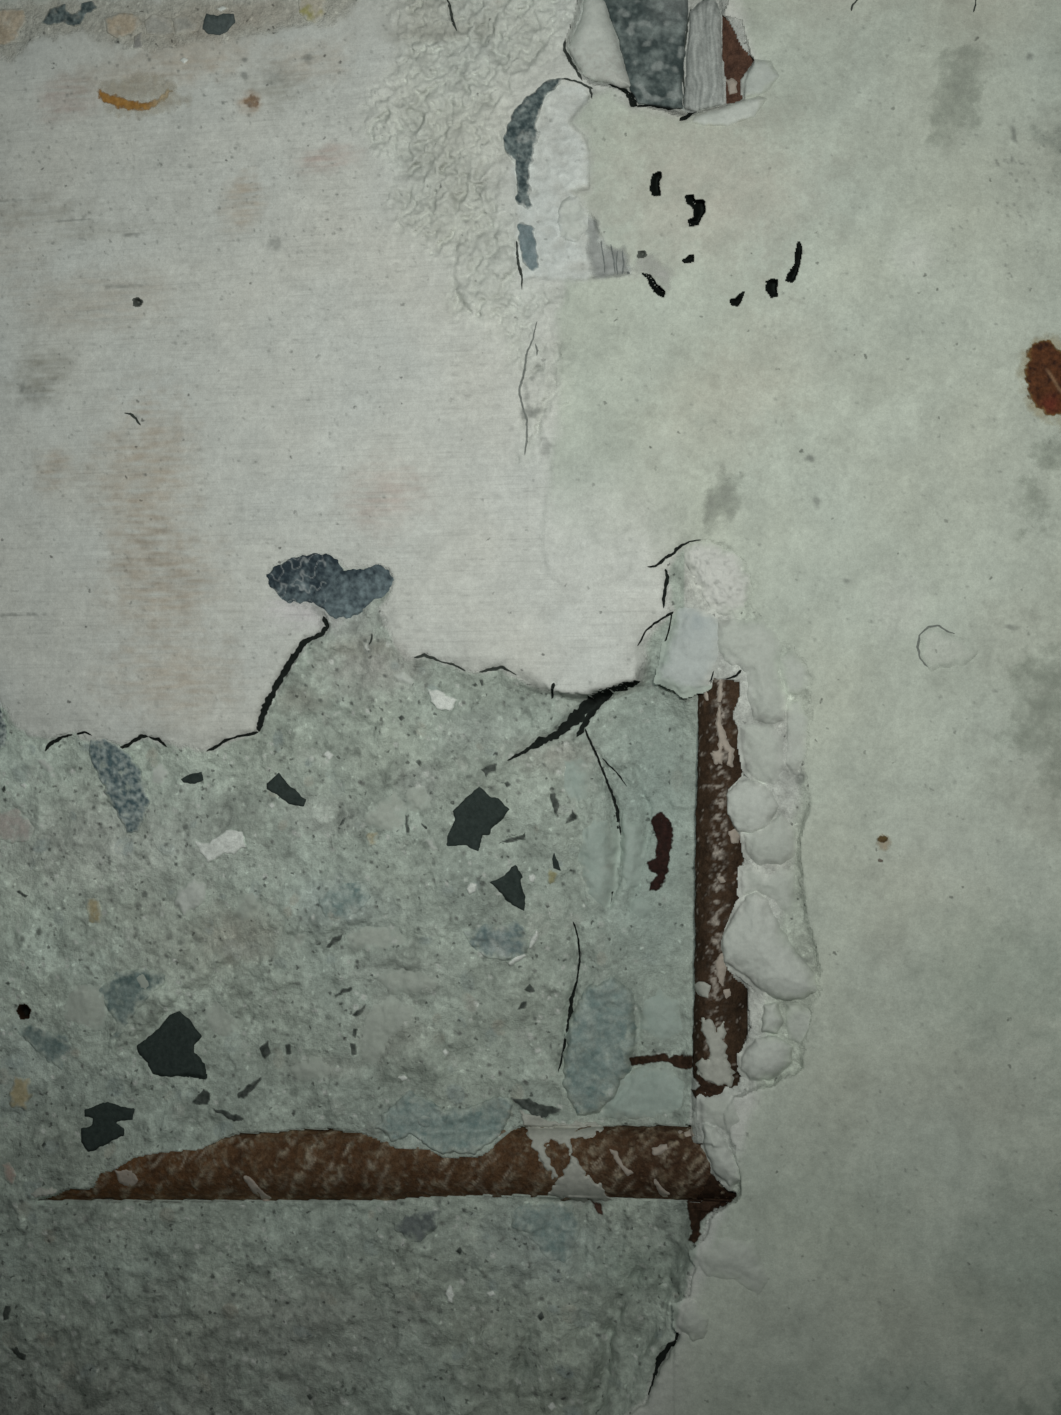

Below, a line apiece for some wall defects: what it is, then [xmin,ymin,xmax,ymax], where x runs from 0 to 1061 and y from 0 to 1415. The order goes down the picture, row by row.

spalling [503,0,779,297]
spalling [730,291,745,306]
corrosion [1024,340,1061,416]
crack [207,616,329,751]
crack [414,653,516,675]
crack [507,539,700,835]
corrosion [647,812,673,891]
spalling [0,538,823,1415]
crack [558,922,581,1072]
corrosion [629,1053,725,1099]
corrosion [687,1174,737,1243]